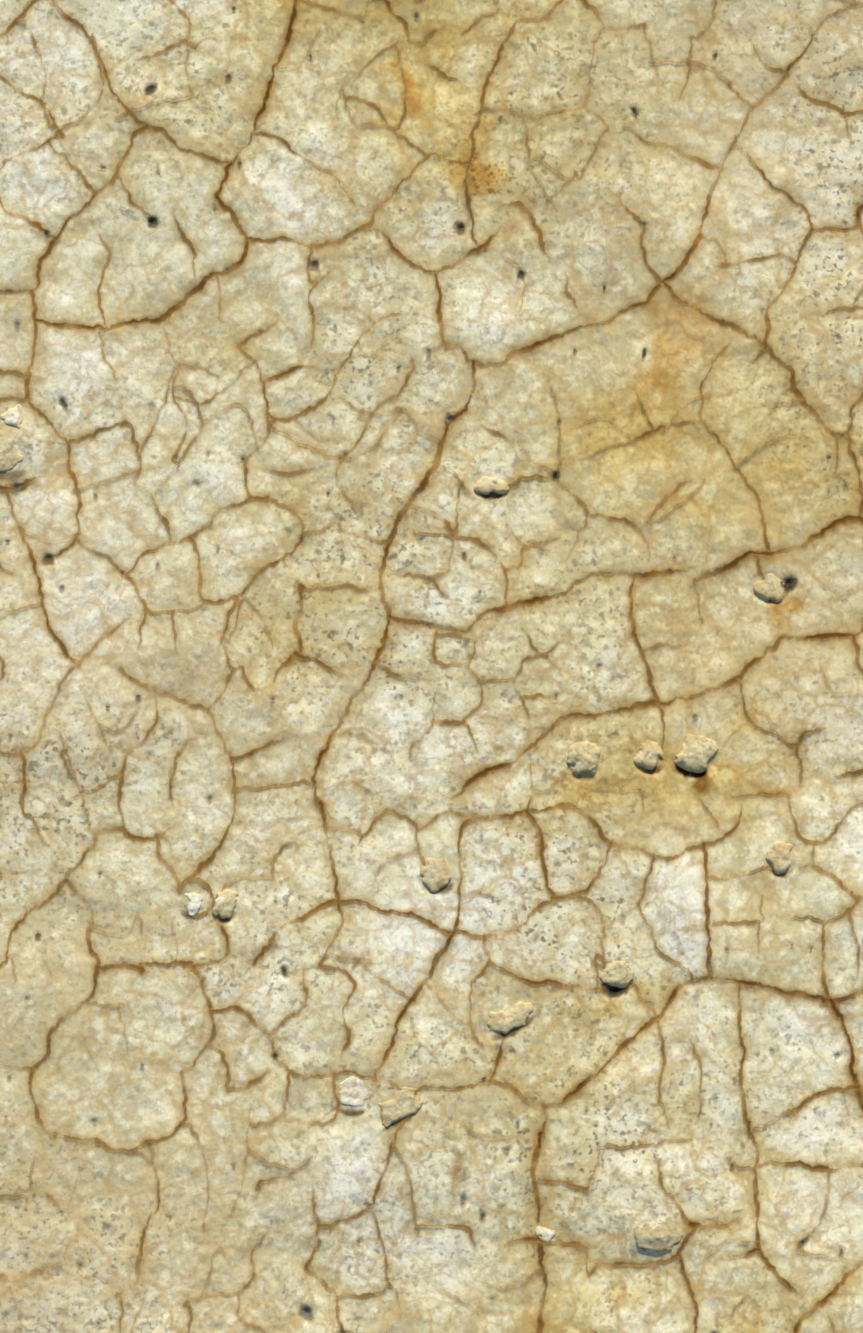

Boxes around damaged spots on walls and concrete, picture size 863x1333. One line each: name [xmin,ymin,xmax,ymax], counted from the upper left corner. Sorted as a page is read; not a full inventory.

crack [0,372,27,398]
crack [354,809,452,848]
crack [342,1018,352,1050]
crack [562,976,710,1106]
crack [787,989,863,1114]
crack [531,1131,544,1217]
crack [537,1178,590,1192]
crack [525,1242,548,1291]
crack [515,1236,589,1261]
crack [587,1221,730,1277]
crack [535,1310,545,1333]
crack [793,1261,863,1333]